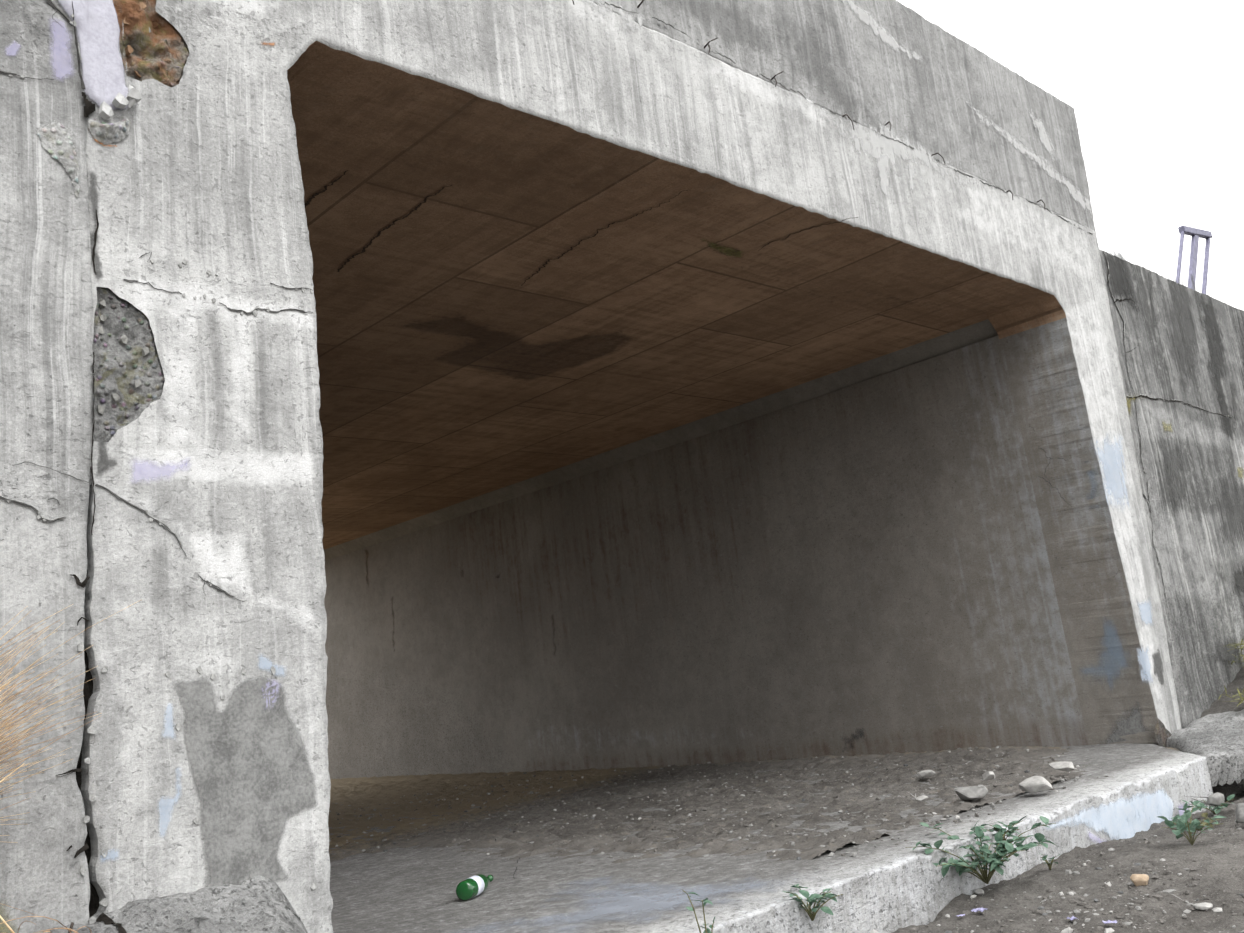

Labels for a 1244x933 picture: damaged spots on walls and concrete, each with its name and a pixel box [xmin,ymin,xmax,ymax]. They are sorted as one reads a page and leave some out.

crack [0,0,86,89]
spalling [92,287,165,442]
crack [304,170,349,208]
crack [337,184,453,272]
crack [521,190,687,286]
crack [601,2,1237,621]
crack [0,352,244,602]
crack [56,569,127,933]